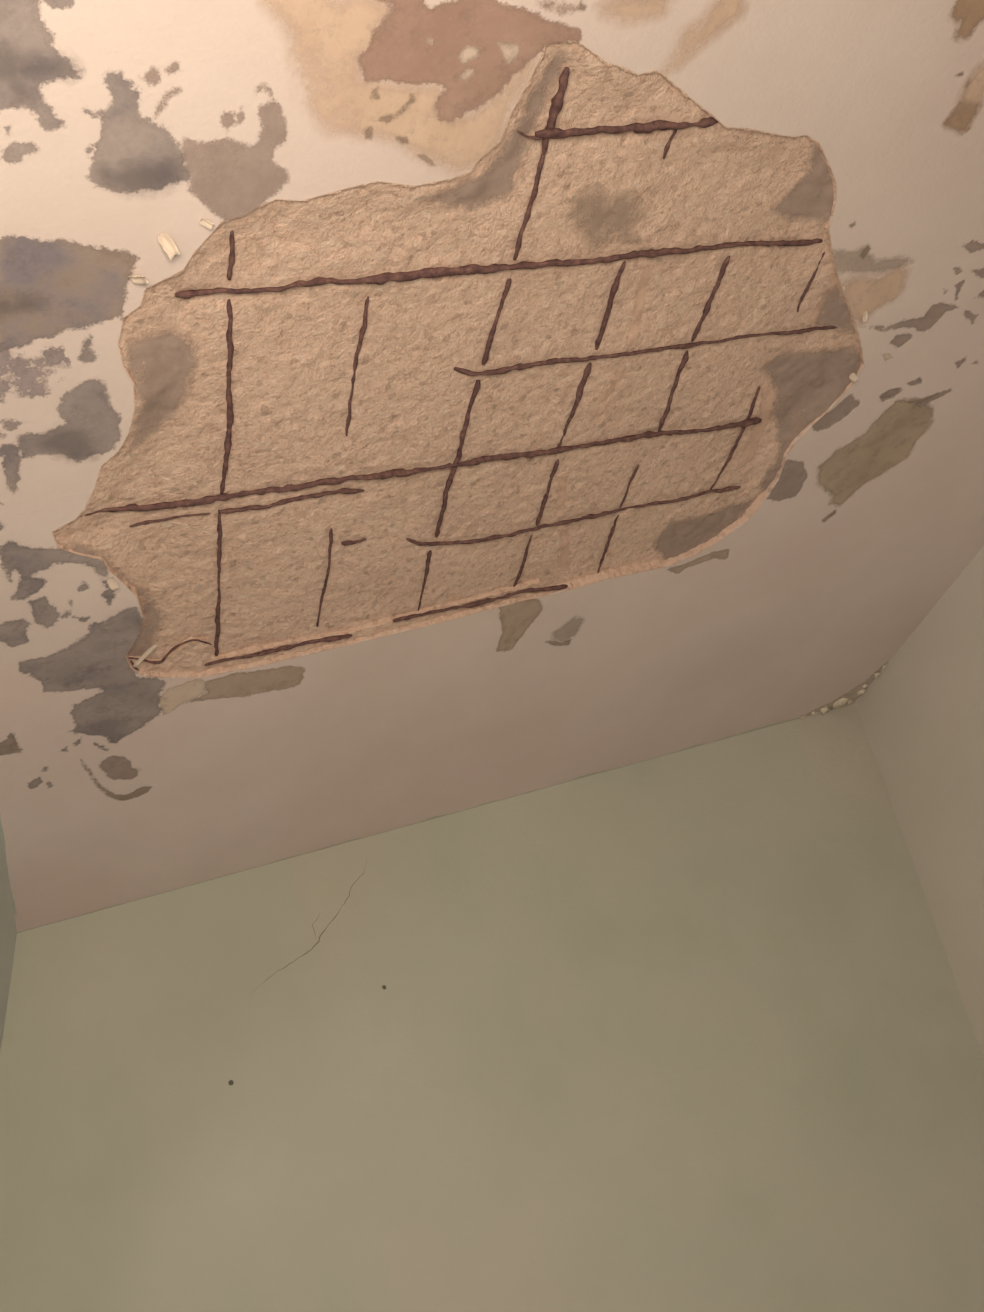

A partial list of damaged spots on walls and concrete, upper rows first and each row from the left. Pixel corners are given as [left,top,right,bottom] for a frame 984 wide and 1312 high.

peeling [963,240,984,252]
peeling [875,267,984,360]
spalling [0,0,865,755]
peeling [880,378,922,401]
peeling [916,388,951,407]
spalling [800,664,887,719]
leakage [87,756,151,800]